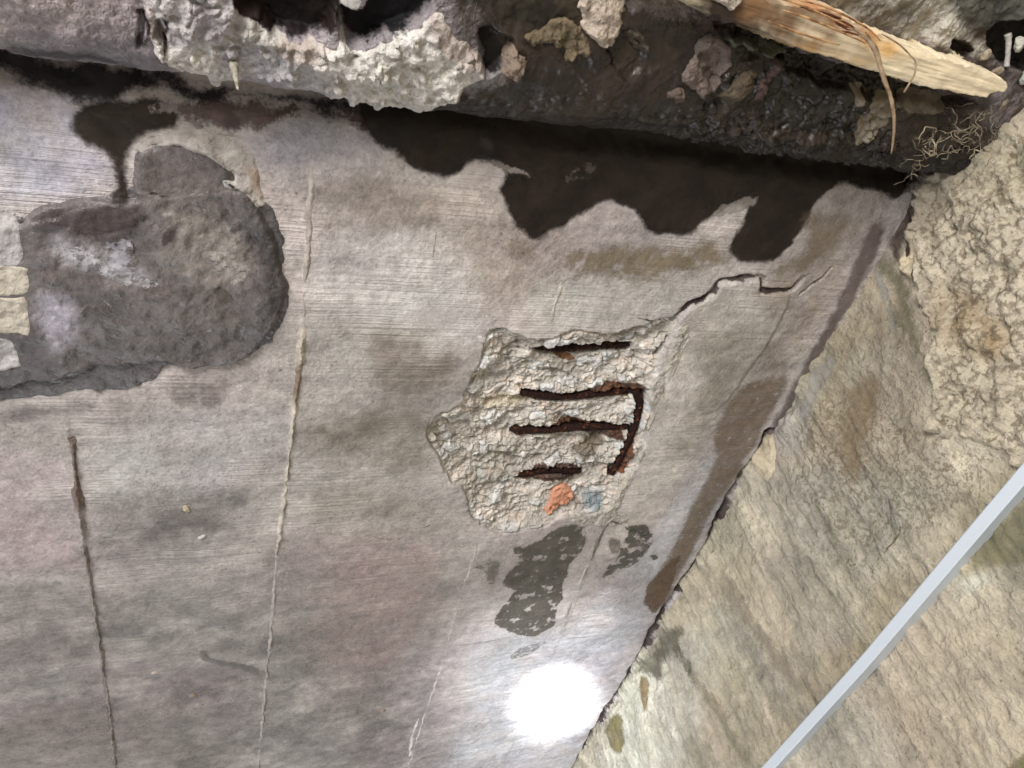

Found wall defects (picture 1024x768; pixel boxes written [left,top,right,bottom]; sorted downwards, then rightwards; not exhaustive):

water stain [0,0,985,613]
crack [639,273,824,322]
corrosion [588,380,644,396]
corrosion [522,462,579,482]
spalling [426,316,690,533]
corrosion [543,415,634,473]
water stain [476,524,586,659]